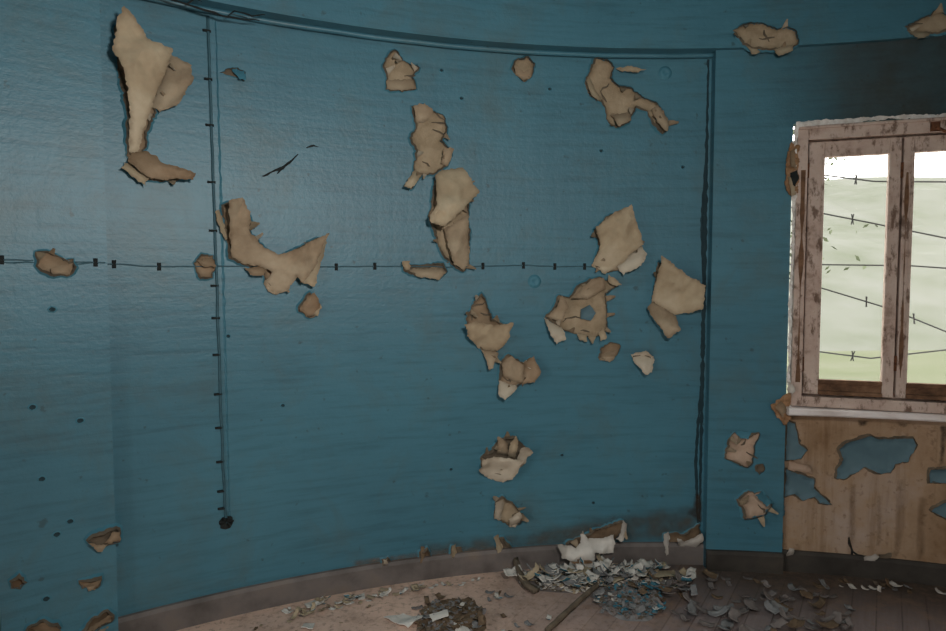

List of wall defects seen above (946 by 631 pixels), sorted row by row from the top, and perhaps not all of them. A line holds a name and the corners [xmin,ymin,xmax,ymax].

peeling [111,6,196,185]
peeling [381,49,421,94]
peeling [583,57,679,136]
peeling [732,19,800,56]
peeling [400,103,480,280]
peeling [192,197,329,319]
peeling [464,291,541,400]
peeling [543,204,706,375]
peeling [734,113,946,564]
peeling [478,431,533,482]
peeling [723,430,765,475]
peeling [493,494,529,553]